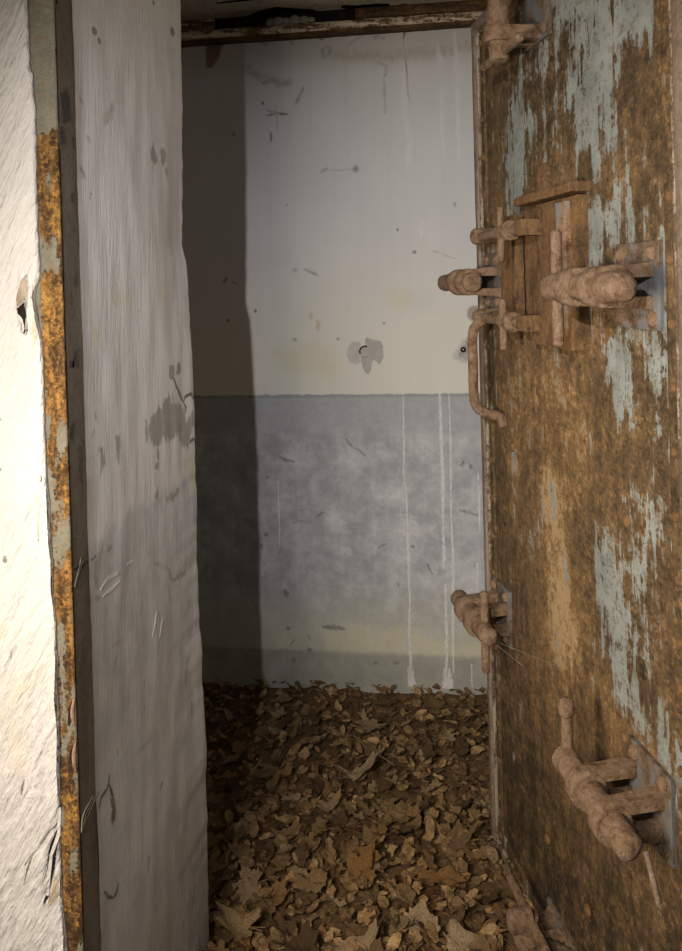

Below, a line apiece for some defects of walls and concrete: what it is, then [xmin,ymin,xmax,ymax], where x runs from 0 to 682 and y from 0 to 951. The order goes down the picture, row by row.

peeling [16,285,35,336]
corrosion [26,285,41,350]
peeling [336,335,385,376]
peeling [450,334,479,366]
damp [270,391,482,690]
crack [3,477,88,951]